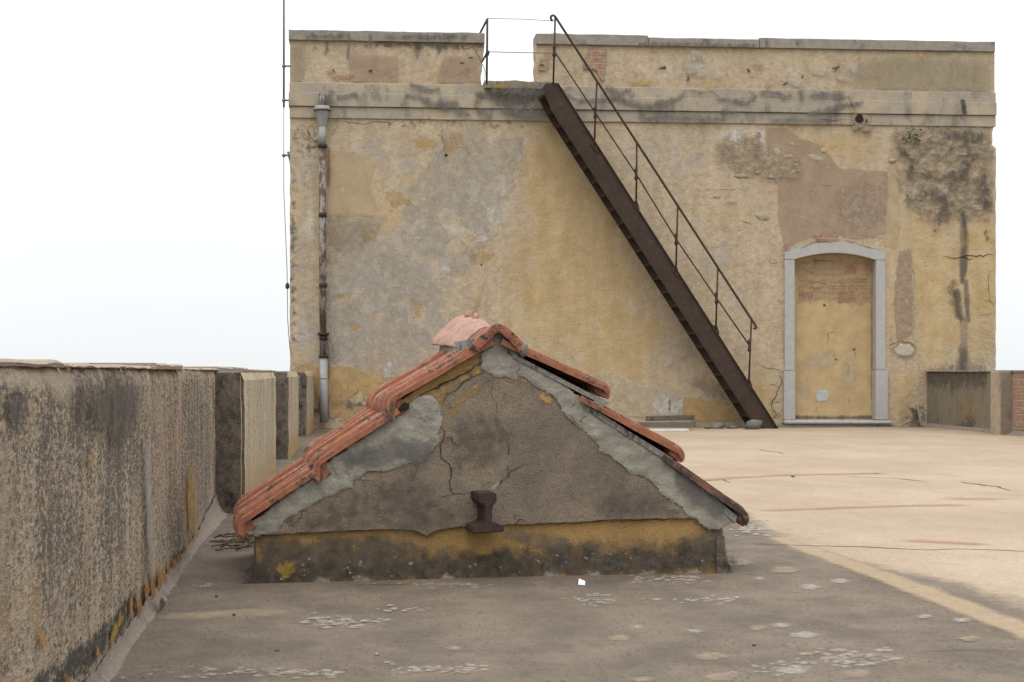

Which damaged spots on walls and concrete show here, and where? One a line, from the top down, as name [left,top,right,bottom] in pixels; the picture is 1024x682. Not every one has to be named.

leakage [406,83,547,119]
leakage [563,86,863,123]
spalling [717,130,801,182]
leakage [898,129,991,321]
crack [943,254,994,315]
crack [410,361,525,498]
leakage [241,531,721,584]